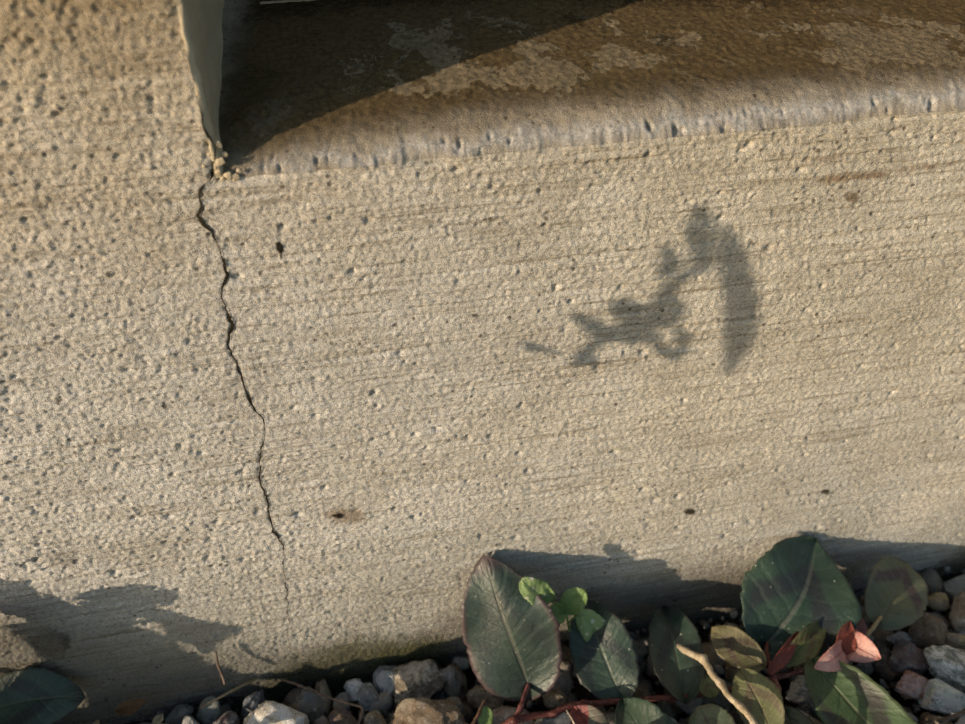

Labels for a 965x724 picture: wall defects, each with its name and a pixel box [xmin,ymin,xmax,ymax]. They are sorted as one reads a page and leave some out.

peeling [341,17,703,99]
damp [218,0,965,155]
peeling [739,13,965,80]
crack [190,91,291,650]